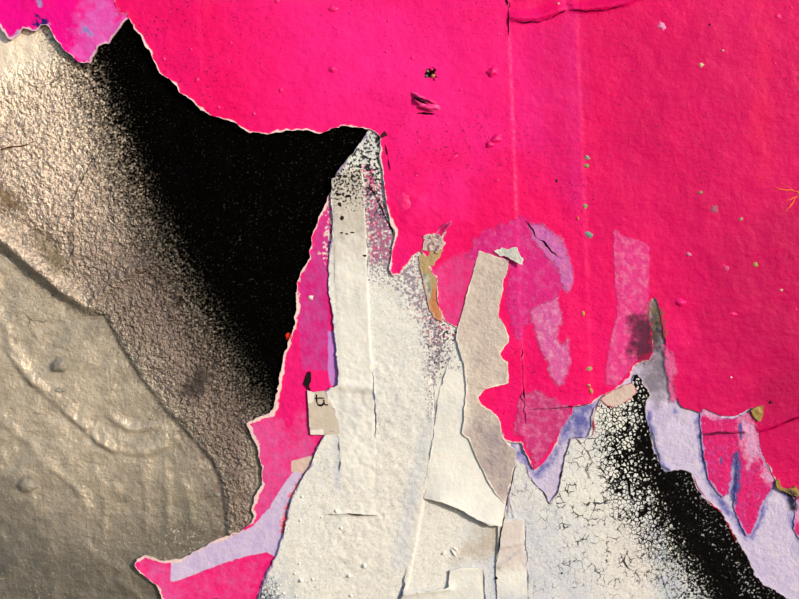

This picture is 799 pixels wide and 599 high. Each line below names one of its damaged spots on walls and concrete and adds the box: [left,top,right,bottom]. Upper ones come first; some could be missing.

crack [526,221,563,259]
crack [577,437,636,503]